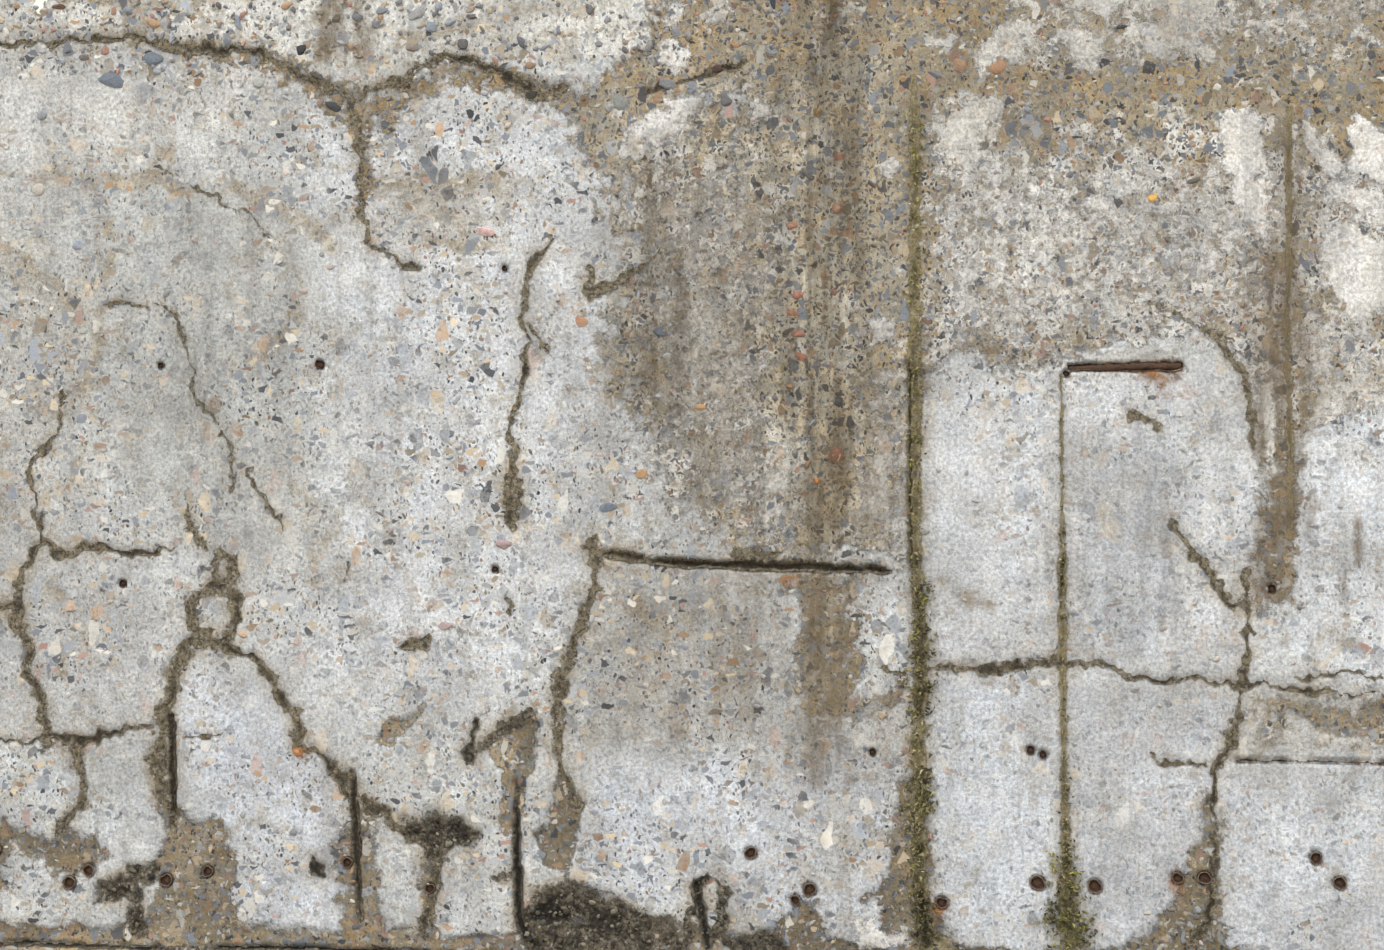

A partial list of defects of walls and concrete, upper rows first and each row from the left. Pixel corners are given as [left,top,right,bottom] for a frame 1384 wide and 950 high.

crack [0,32,570,271]
crack [103,299,283,531]
crack [502,235,555,532]
spalling [218,0,1384,731]
water stain [806,378,852,545]
corrosion [1067,361,1184,385]
crack [0,383,443,942]
crack [549,533,605,815]
crack [881,518,1383,950]
spalling [1253,691,1384,752]
spalling [0,771,1019,950]
spalling [1100,790,1240,950]